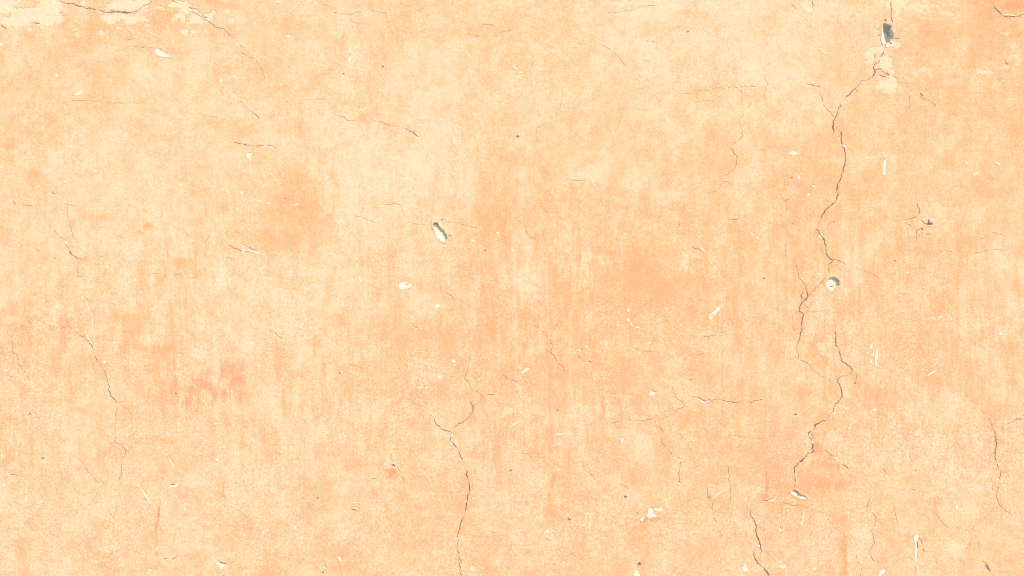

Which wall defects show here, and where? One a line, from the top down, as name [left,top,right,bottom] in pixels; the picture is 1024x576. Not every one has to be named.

peeling [860,0,961,98]
crack [7,203,126,483]
spalling [431,219,451,248]
crack [414,322,564,576]
crack [613,3,893,576]
spalling [823,273,843,294]